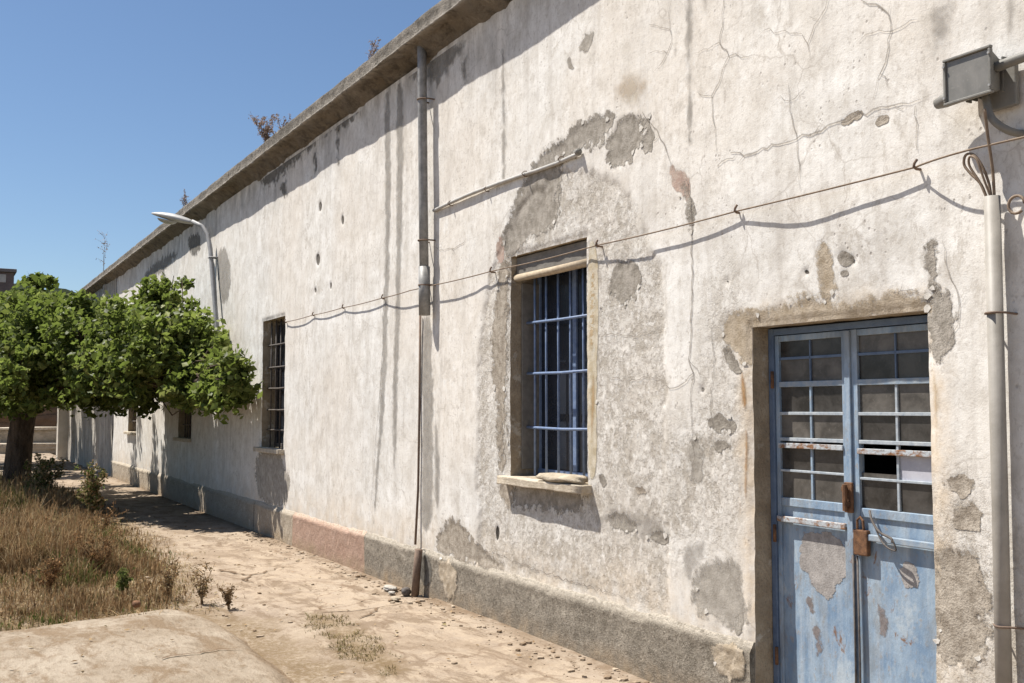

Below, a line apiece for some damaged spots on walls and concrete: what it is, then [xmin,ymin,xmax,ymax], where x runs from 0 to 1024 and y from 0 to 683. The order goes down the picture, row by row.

crack [699,0,934,192]
spalling [490,110,654,515]
crack [613,112,715,477]
spalling [721,239,958,374]
spalling [436,515,504,600]
spalling [689,413,736,483]
spalling [690,557,748,683]
peeling [799,531,846,655]
spalling [942,474,983,532]